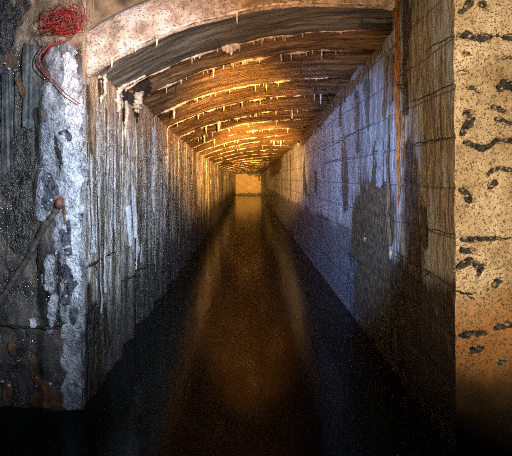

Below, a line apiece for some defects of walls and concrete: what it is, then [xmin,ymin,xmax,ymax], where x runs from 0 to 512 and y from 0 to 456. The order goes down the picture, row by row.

leakage [87,83,111,402]
leakage [106,125,142,270]
leakage [106,32,312,118]
efflorescence [93,0,355,70]
leakage [151,79,298,264]
leakage [301,42,394,262]
rust [391,0,404,207]
crack [413,137,454,145]